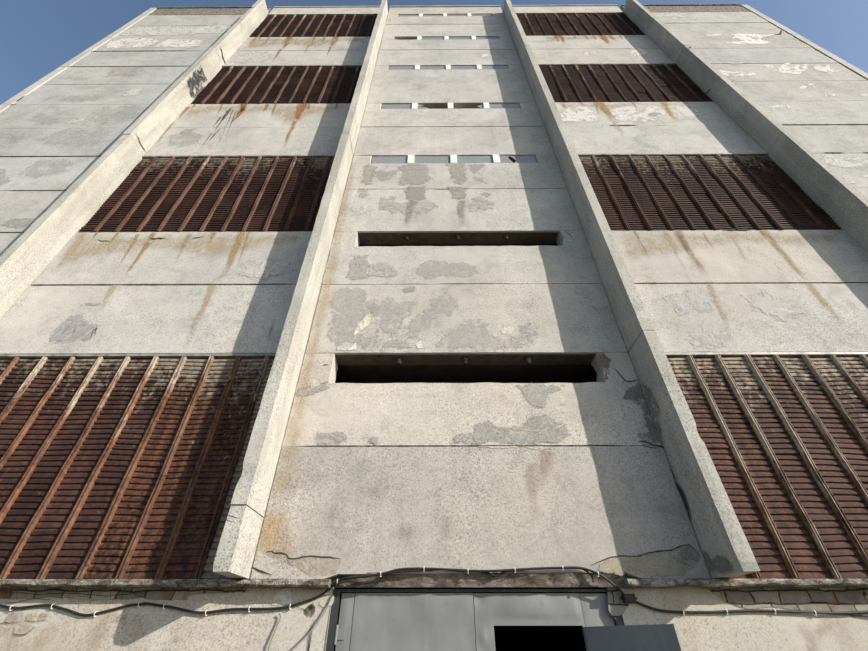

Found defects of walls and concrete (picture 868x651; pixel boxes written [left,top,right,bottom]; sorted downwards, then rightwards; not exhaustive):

peeling [361,163,431,186]
peeling [446,162,484,184]
rust [67,232,156,263]
rust [205,232,266,264]
rust [634,231,700,265]
peeling [416,260,478,279]
peeling [327,255,458,350]
peeling [437,321,538,351]
peeling [454,383,570,450]
crack [670,470,690,519]